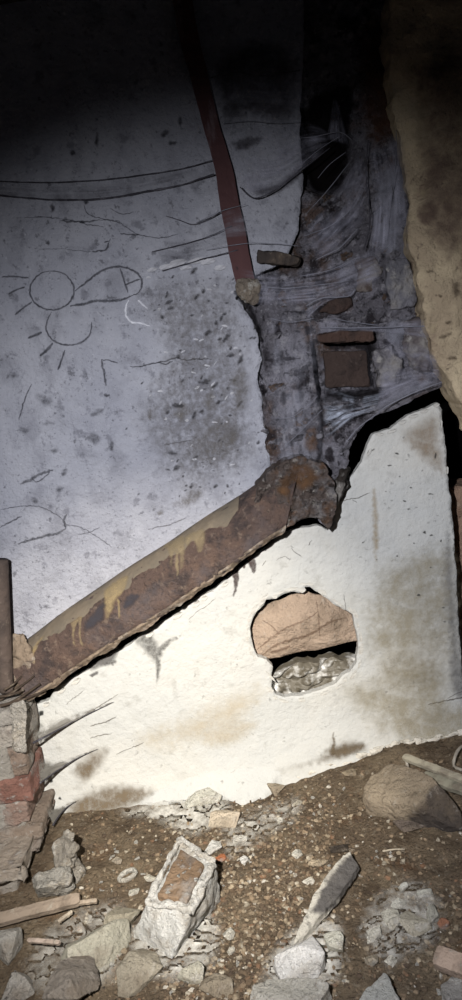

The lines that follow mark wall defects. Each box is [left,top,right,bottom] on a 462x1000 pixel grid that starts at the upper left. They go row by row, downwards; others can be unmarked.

spalling [146,257,226,299]
spalling [194,313,242,363]
spalling [182,356,253,424]
flaking render [375,403,440,436]
crack [6,470,109,545]
rust [105,578,126,612]
rust [231,555,256,593]
flaking render [246,582,364,696]
damp [327,715,462,767]